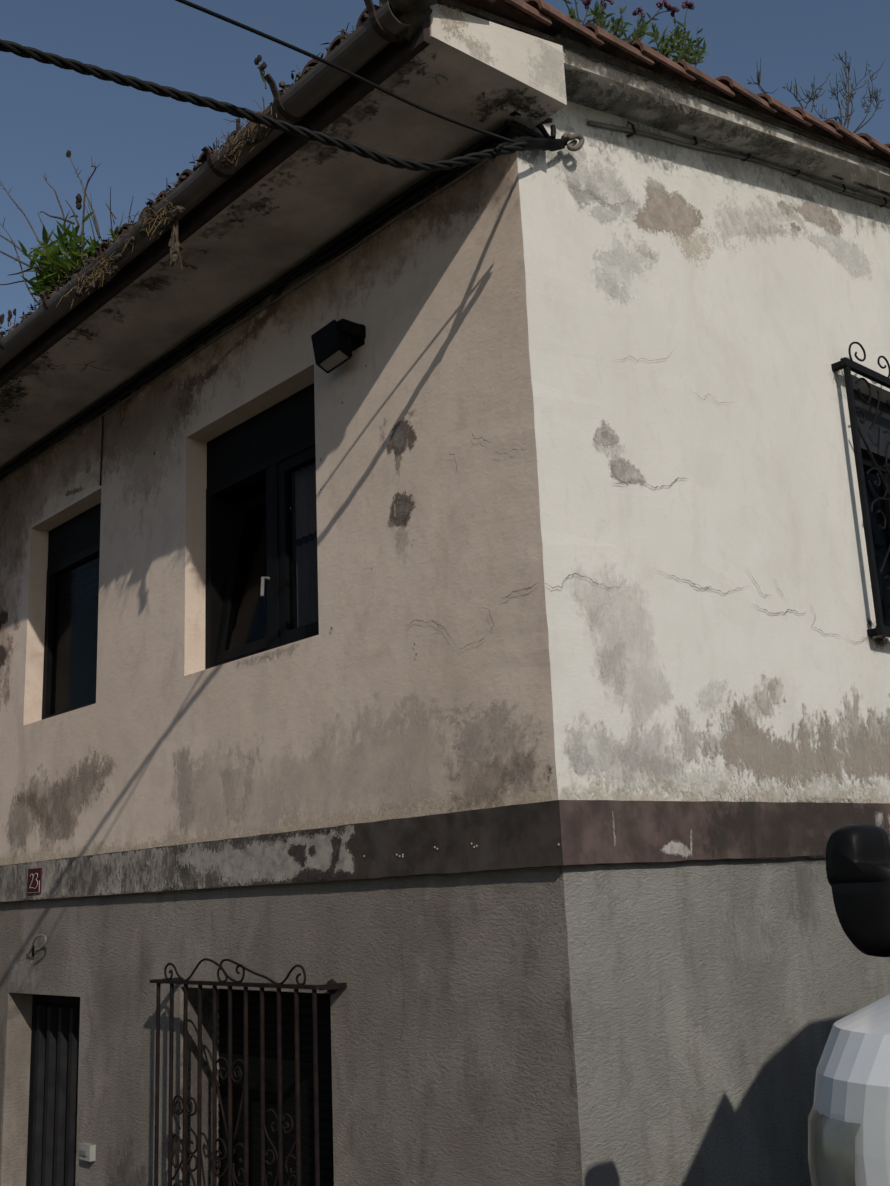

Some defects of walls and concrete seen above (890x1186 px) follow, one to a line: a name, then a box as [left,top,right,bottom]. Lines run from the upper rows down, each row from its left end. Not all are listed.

leakage [560,17,890,200]
spalling [545,125,844,263]
spalling [379,409,417,475]
spalling [593,418,646,485]
spalling [388,488,415,530]
crack [406,573,627,649]
crack [655,568,882,643]
leakage [0,674,890,866]
peeling [622,716,890,830]
peeling [0,825,355,902]
peeling [661,839,691,859]